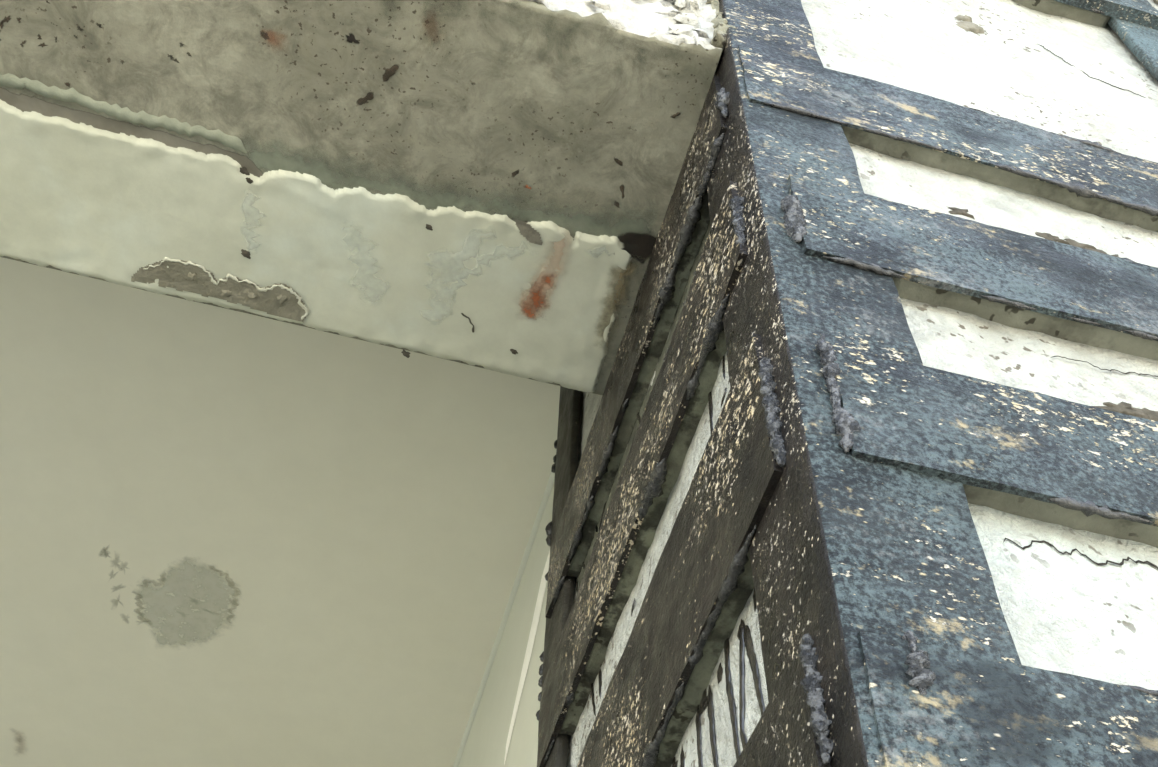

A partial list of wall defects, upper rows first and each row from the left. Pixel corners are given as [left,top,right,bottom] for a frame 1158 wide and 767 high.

spalling [654,0,710,46]
spalling [383,65,399,82]
spalling [356,92,374,105]
peeling [0,87,263,184]
spalling [946,206,974,219]
spalling [1035,232,1120,258]
spalling [131,257,309,322]
corrosion [522,240,564,318]
crack [1003,538,1158,569]